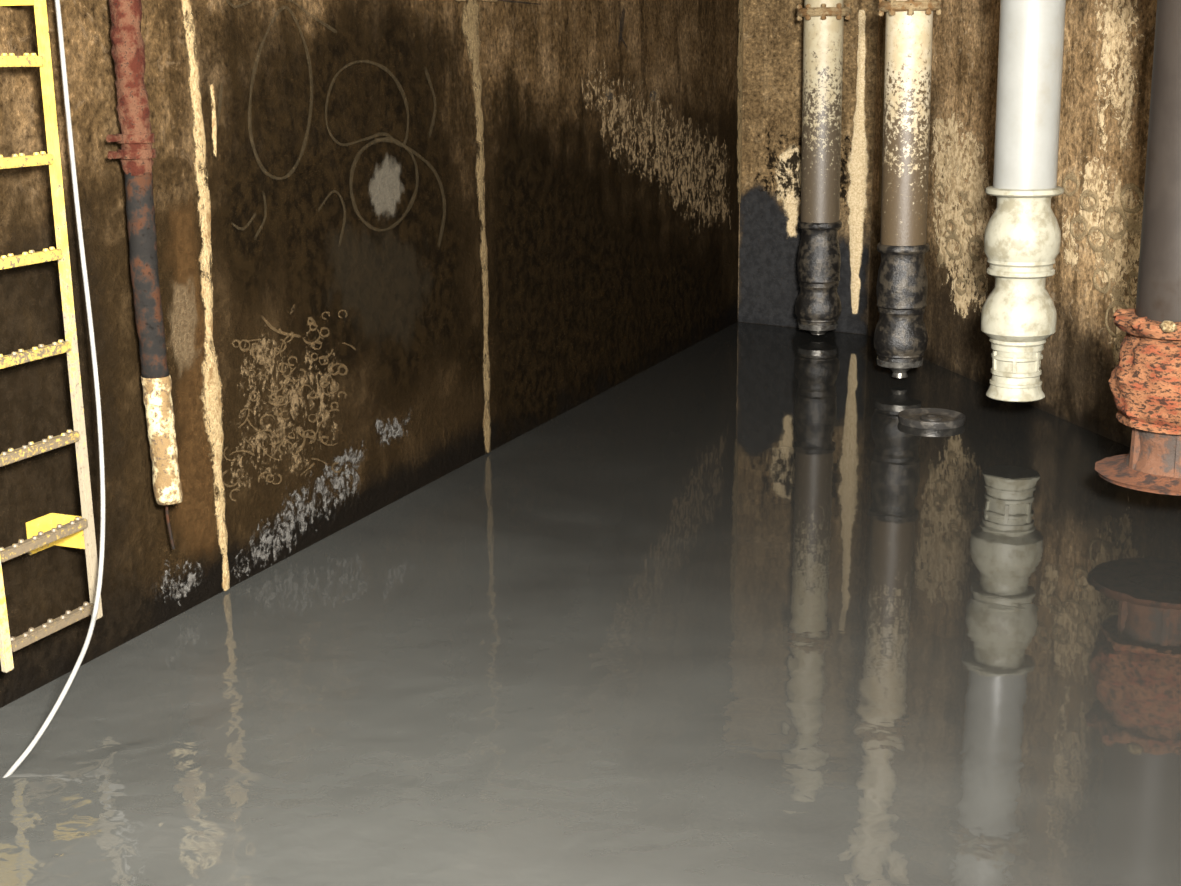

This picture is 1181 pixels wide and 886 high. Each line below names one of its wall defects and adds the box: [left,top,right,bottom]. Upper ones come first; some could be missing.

water stain [161,561,200,605]
water stain [173,0,725,591]